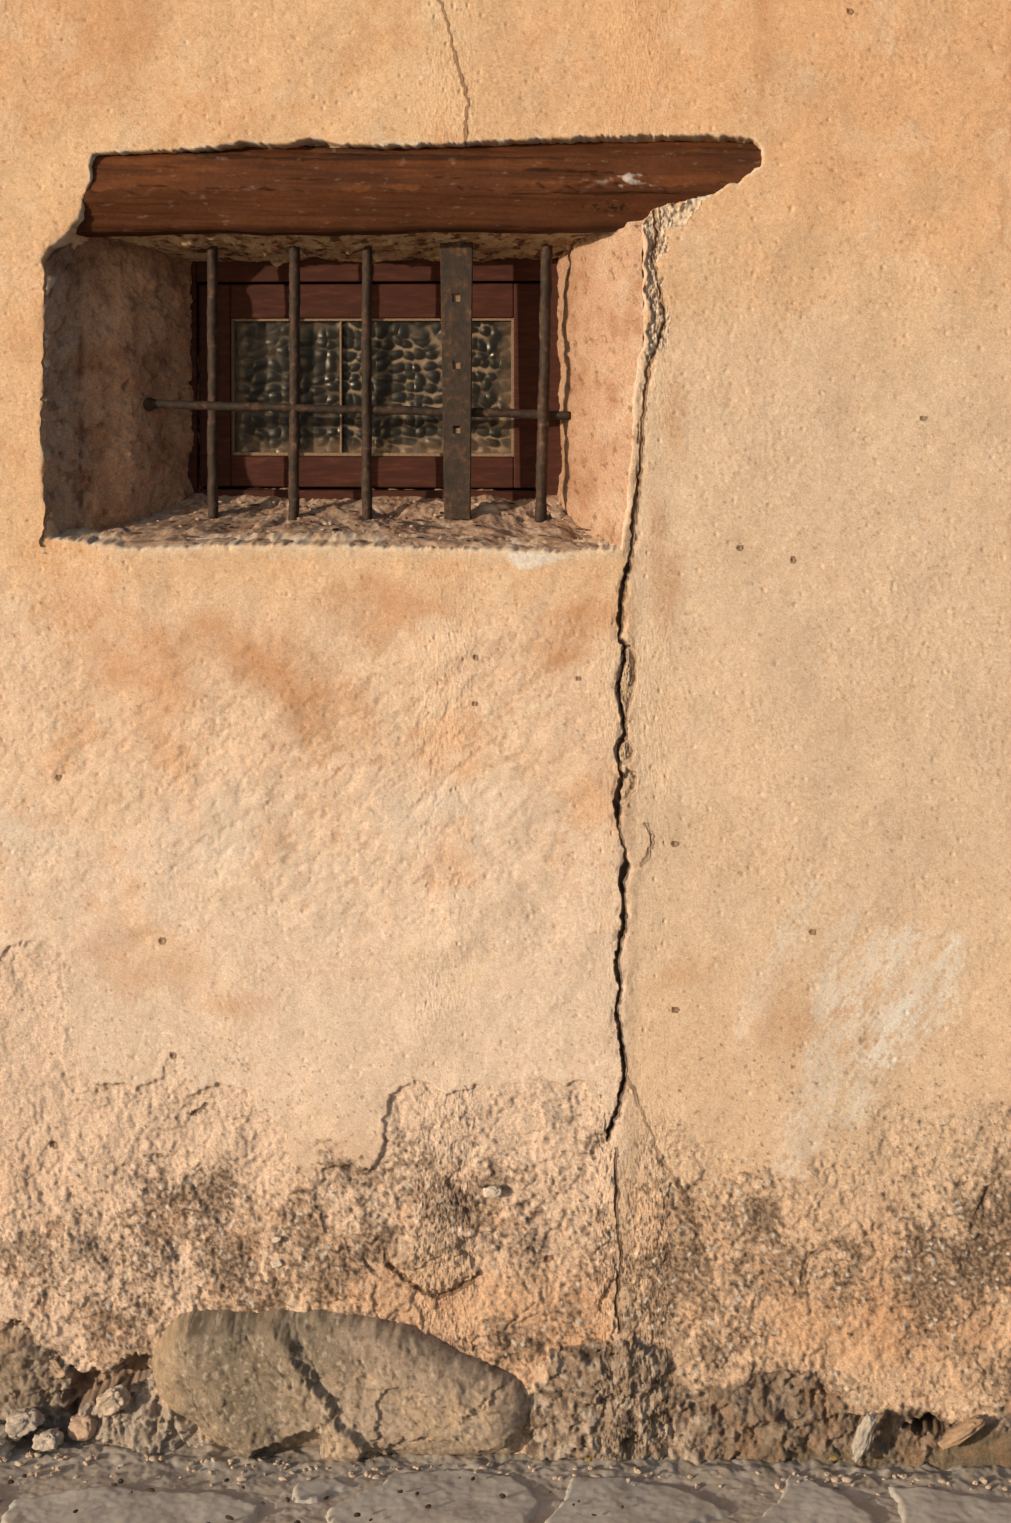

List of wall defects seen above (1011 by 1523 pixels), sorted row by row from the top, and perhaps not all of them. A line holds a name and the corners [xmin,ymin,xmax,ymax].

crack [436,0,469,147]
spalling [642,194,713,363]
crack [605,209,724,1334]
flaking render [0,938,1011,1470]